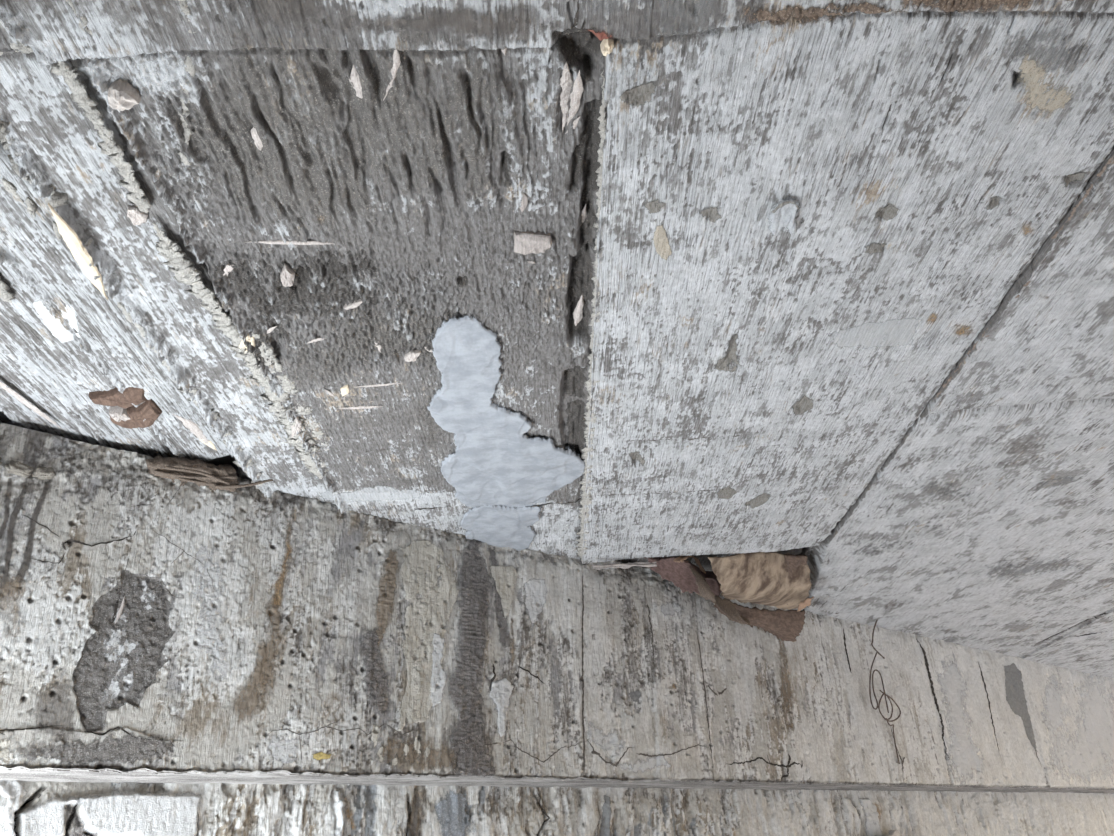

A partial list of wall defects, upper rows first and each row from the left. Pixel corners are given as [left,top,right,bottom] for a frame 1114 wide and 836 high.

corrosion [742,0,1032,26]
water stain [0,478,49,593]
flaking render [17,570,175,766]
water stain [361,539,547,777]
peeling [14,790,201,836]
water stain [435,790,476,836]